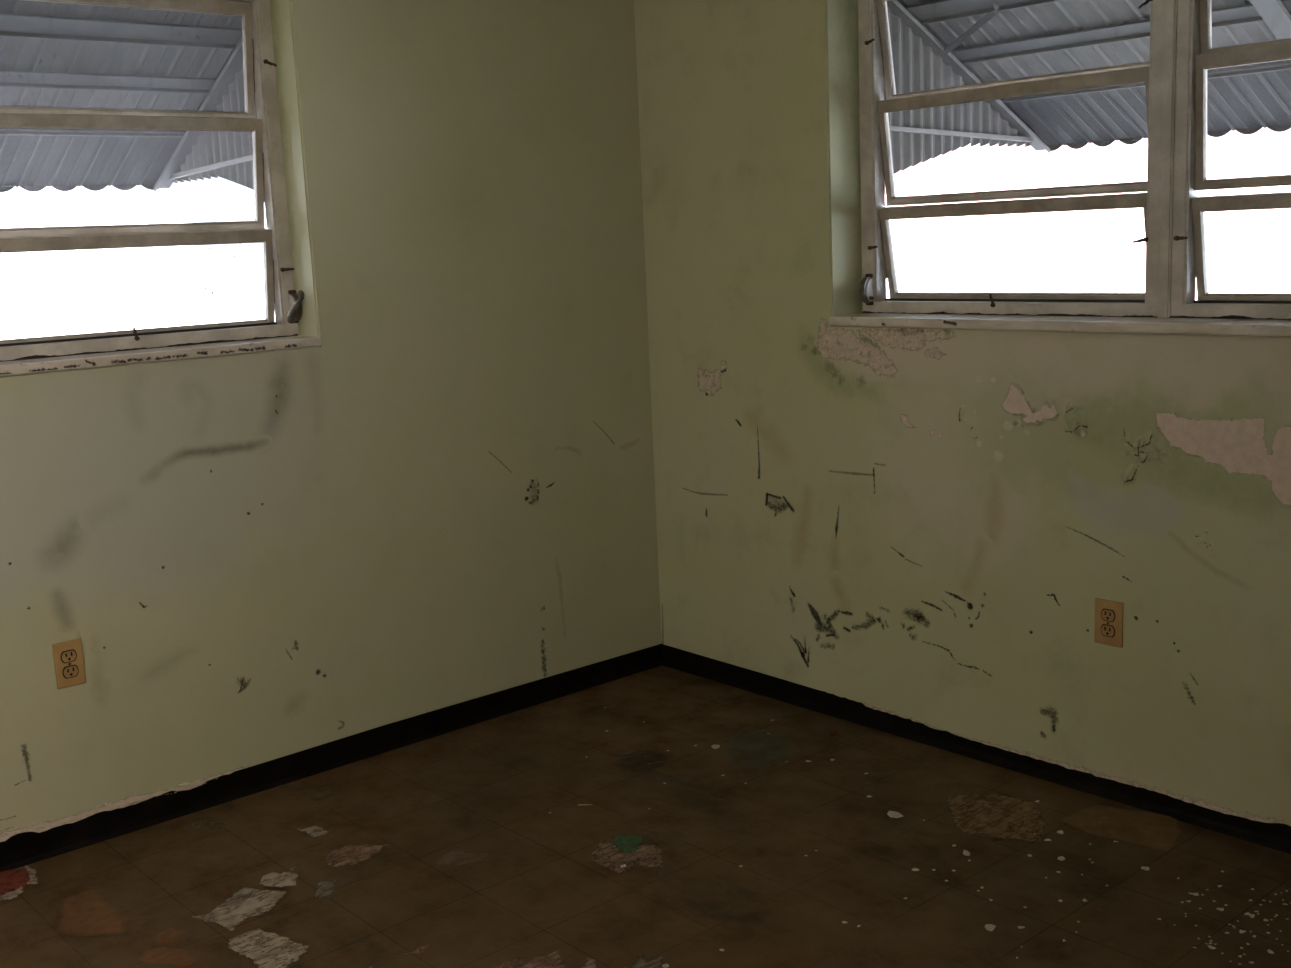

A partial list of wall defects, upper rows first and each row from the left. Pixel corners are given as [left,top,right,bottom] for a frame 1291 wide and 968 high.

peeling [1002,383,1061,428]
peeling [1154,409,1291,509]